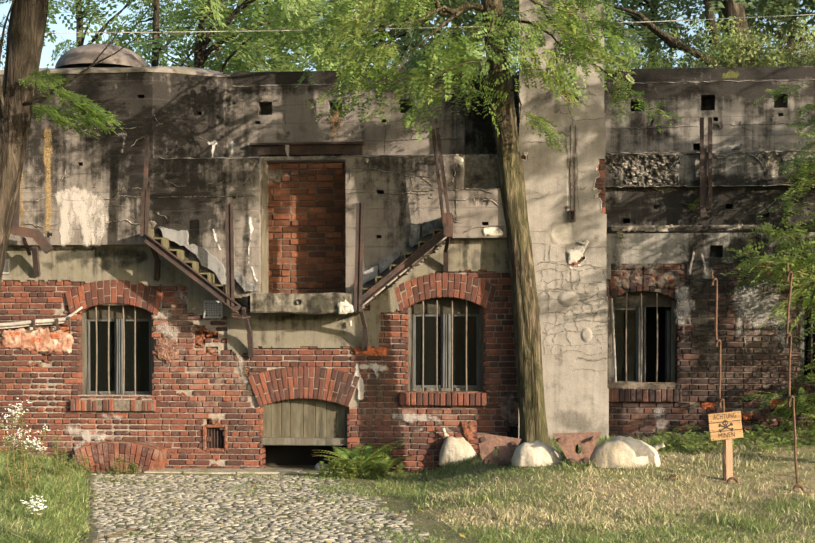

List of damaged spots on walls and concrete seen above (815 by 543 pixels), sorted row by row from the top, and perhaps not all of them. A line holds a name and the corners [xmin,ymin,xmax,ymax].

crack [67,115,163,147]
rust [44,129,52,232]
crack [20,170,254,225]
spalling [592,154,683,213]
water stain [49,186,147,269]
crack [532,231,610,371]
spalling [2,326,74,367]
spalling [154,337,179,363]